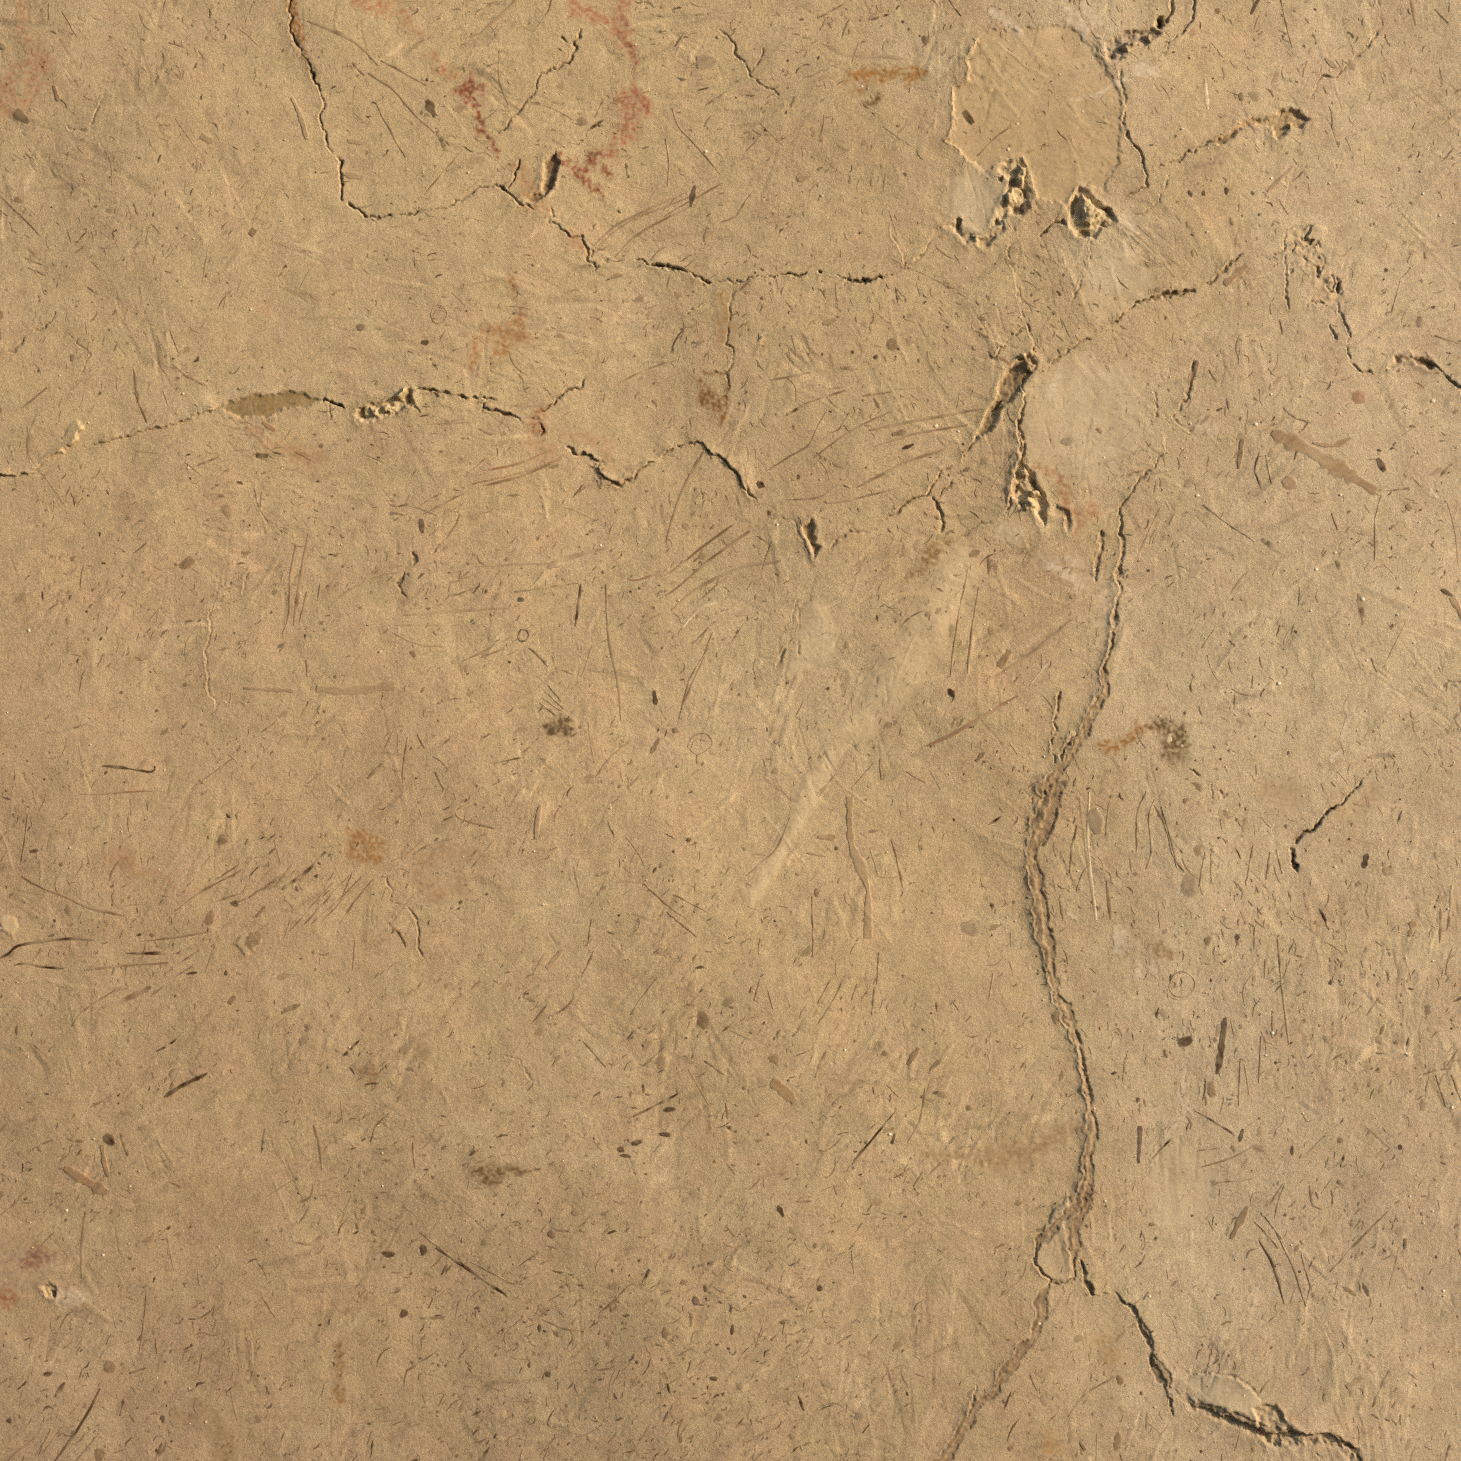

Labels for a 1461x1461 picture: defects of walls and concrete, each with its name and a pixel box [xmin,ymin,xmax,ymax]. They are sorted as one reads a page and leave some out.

corrosion [556,0,660,202]
crack [285,0,946,401]
crack [944,0,1006,178]
spalling [944,24,1163,250]
crack [1117,0,1230,217]
crack [0,461,44,479]
spalling [223,390,320,420]
crack [319,396,346,421]
spalling [354,386,415,425]
crack [411,218,1461,556]
crack [393,543,441,603]
crack [929,357,1374,1461]